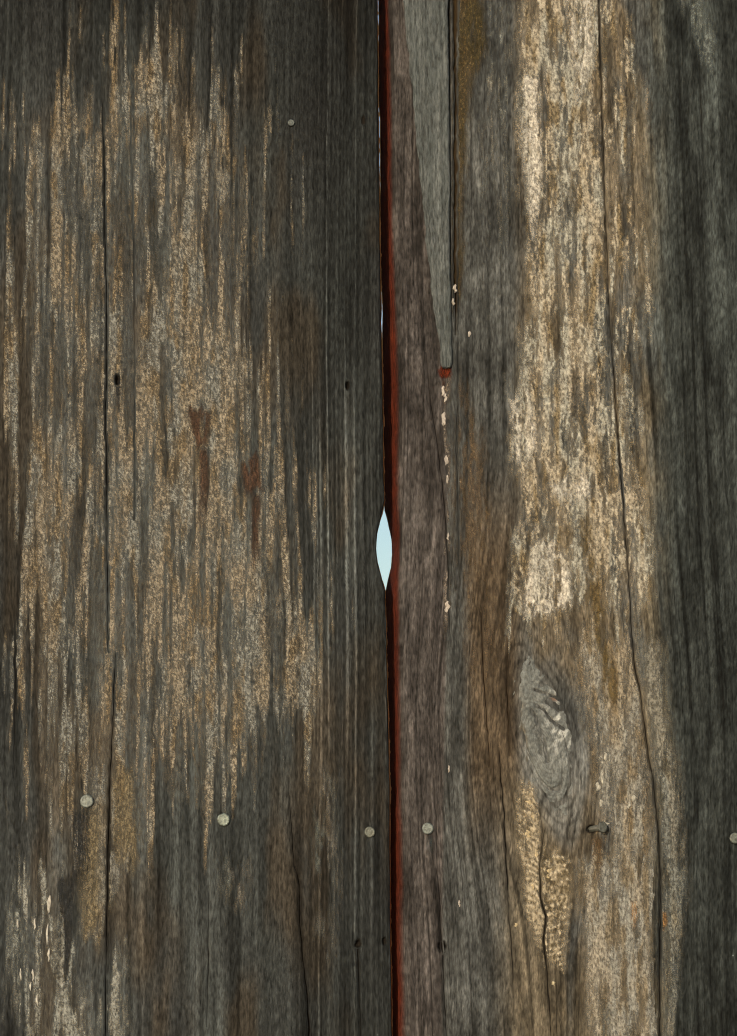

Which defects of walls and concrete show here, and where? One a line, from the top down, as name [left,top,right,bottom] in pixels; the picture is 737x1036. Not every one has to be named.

crack [425,0,460,647]
crack [597,0,663,1036]
crack [287,777,312,1036]
crack [425,778,448,1036]
crack [480,612,523,1025]
crack [538,808,552,1036]